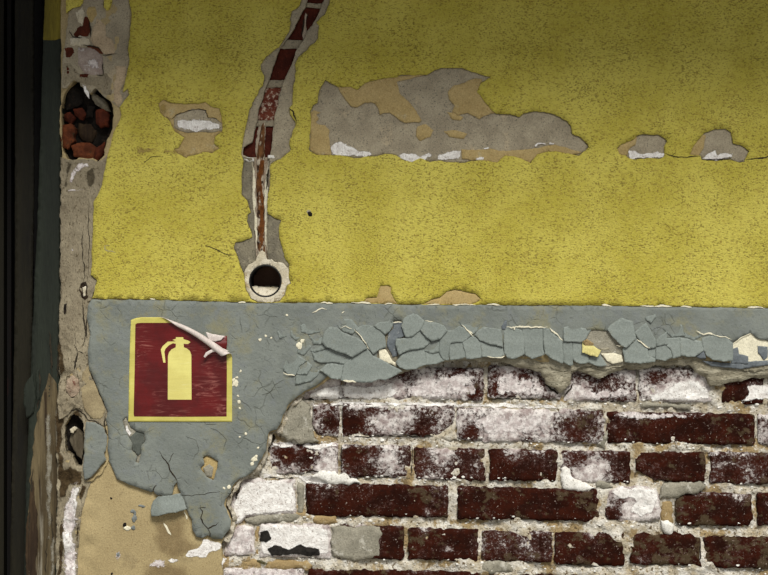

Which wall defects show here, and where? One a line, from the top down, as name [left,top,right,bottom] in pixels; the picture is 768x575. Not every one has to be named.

peeling [158,100,223,158]
peeling [309,68,589,163]
peeling [690,129,749,162]
flaking render [23,0,131,575]
leakage [310,371,558,436]
spalling [222,305,768,575]
leakage [573,388,629,400]
leakage [614,412,686,420]
leakage [650,380,709,401]
leakage [742,385,768,401]
crack [159,451,220,536]
leakage [612,486,658,517]